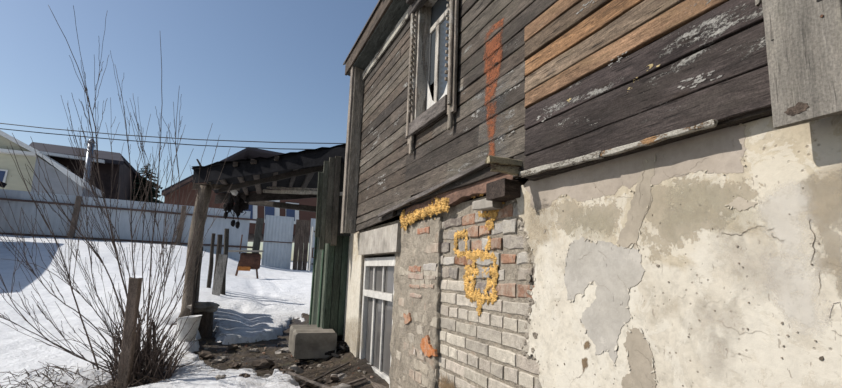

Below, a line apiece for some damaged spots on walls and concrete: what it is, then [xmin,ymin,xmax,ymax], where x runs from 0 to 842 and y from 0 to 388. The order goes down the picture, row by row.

corrosion [484,18,504,156]
peeling [677,69,723,89]
spalling [414,335,438,358]
spalling [507,199,540,374]
flaking render [524,123,763,388]